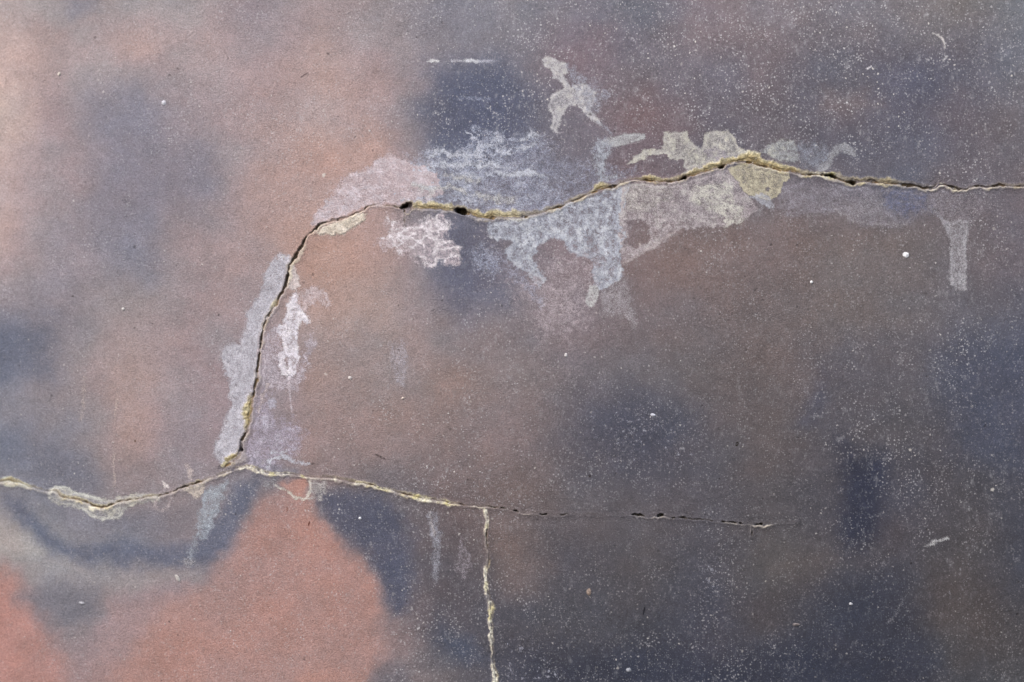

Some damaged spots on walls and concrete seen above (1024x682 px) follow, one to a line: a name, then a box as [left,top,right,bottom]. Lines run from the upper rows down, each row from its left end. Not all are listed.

water stain [310,56,995,356]
water stain [212,252,332,502]
crack [0,145,1024,682]